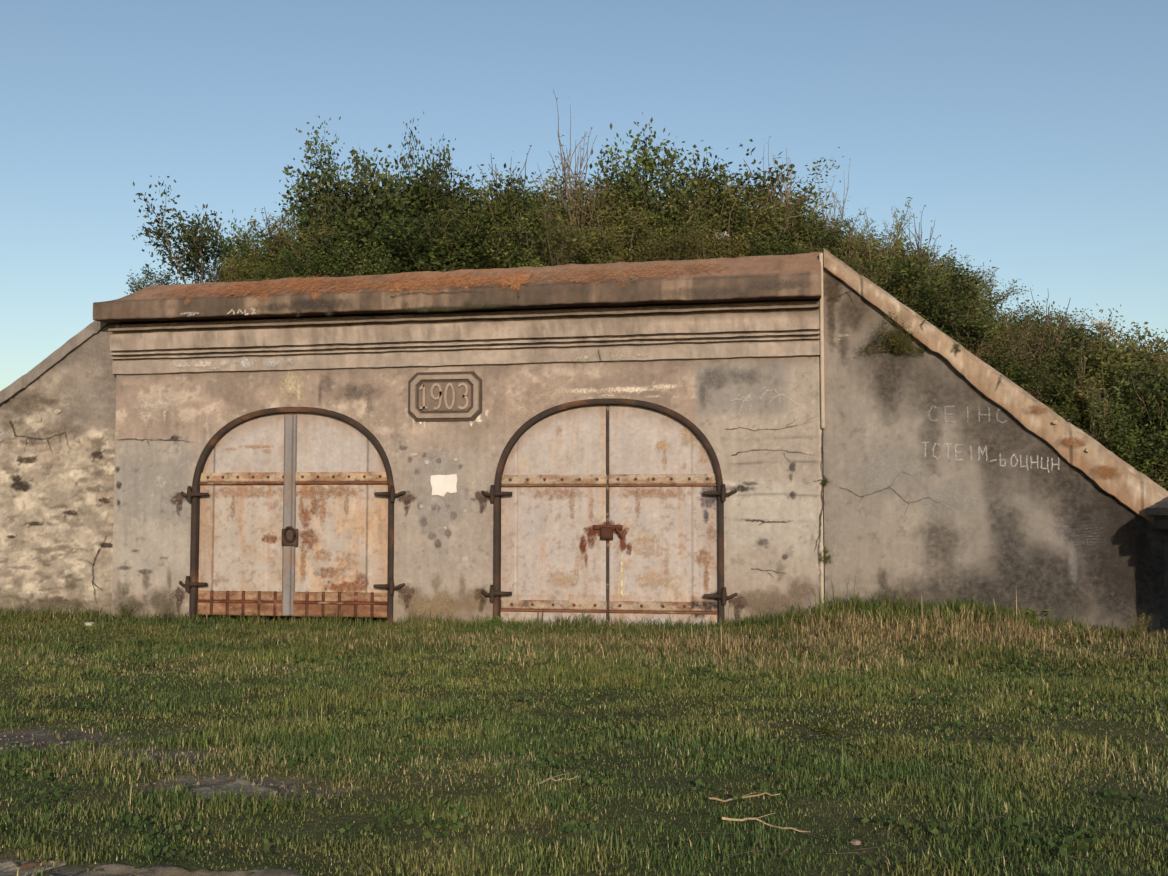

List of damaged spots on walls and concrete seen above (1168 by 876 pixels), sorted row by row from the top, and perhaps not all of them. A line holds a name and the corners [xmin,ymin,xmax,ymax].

corrosion [299,485,366,593]
peeling [399,446,462,480]
peeling [418,493,467,547]
corrosion [579,500,631,602]
crack [727,408,934,549]
damp [933,449,1166,618]